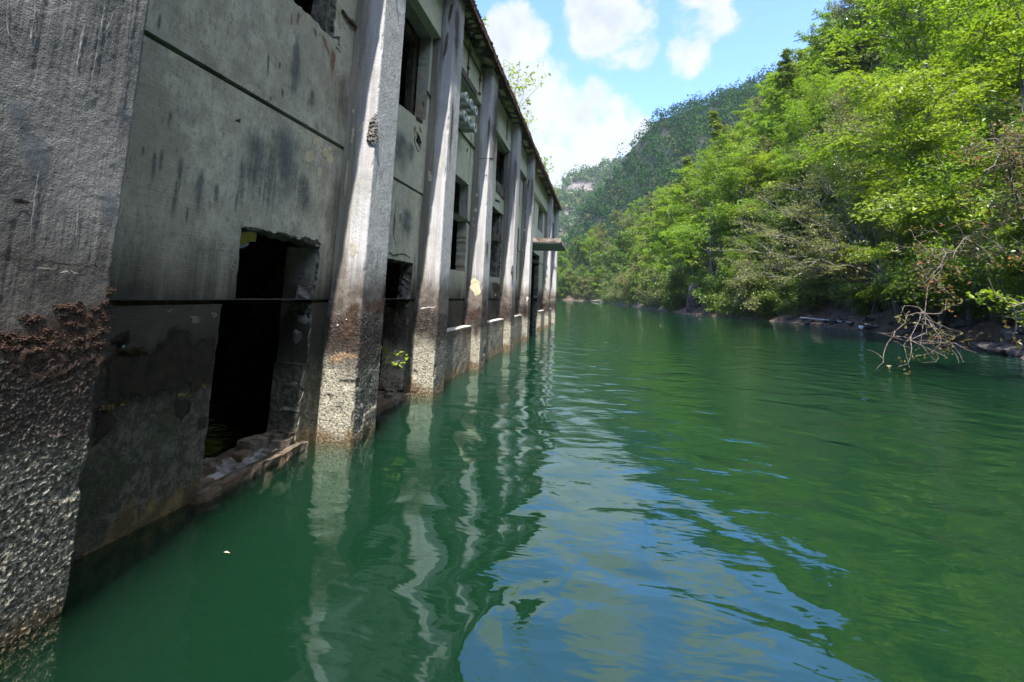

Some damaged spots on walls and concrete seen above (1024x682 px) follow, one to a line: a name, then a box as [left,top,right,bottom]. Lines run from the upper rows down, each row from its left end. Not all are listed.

spalling [350,109,379,146]
water stain [235,135,308,208]